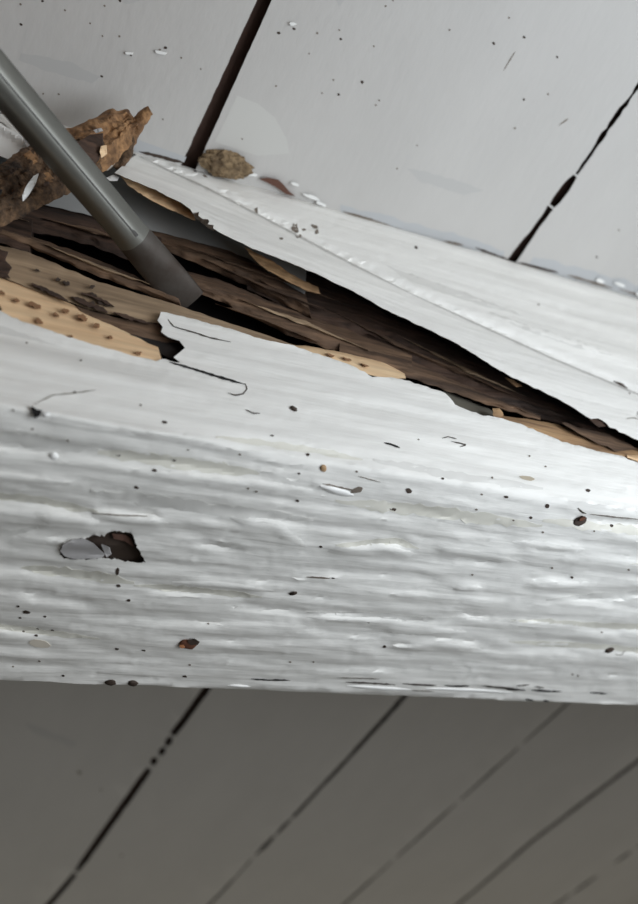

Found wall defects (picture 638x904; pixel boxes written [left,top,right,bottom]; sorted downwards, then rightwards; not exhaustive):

peeling [0,115,29,164]
crack [168,319,230,342]
spalling [0,167,638,462]
crack [170,362,261,414]
peeling [60,531,145,563]